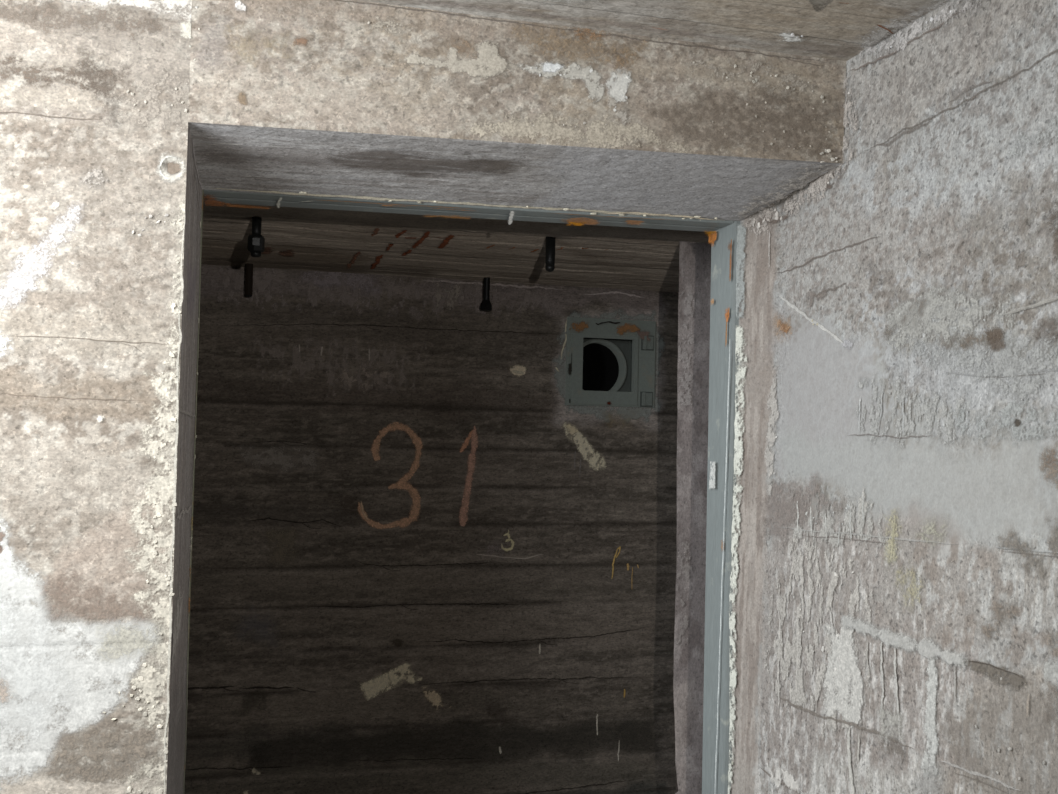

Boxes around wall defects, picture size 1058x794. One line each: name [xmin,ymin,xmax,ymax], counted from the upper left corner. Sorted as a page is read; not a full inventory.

crack [845,49,1058,154]
rust [555,213,650,226]
crack [774,236,879,348]
leakage [44,573,152,622]
leakage [48,724,161,782]
crack [777,696,911,760]
crack [942,761,1021,792]